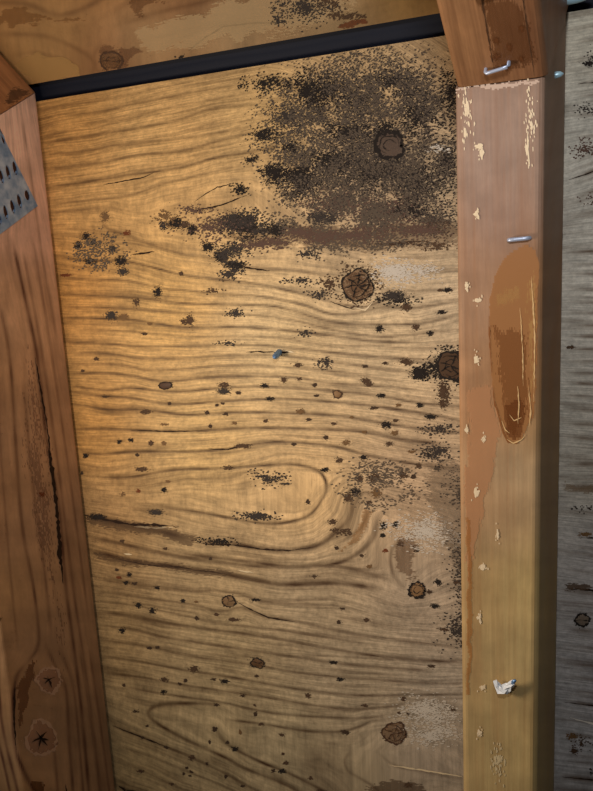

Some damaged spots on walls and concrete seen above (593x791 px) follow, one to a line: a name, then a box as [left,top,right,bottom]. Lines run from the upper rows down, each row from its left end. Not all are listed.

damp [268,0,367,32]
mould [568,137,593,159]
damp [149,54,458,295]
damp [382,245,539,659]
crack [35,358,63,582]
damp [342,472,387,504]
damp [327,519,352,550]